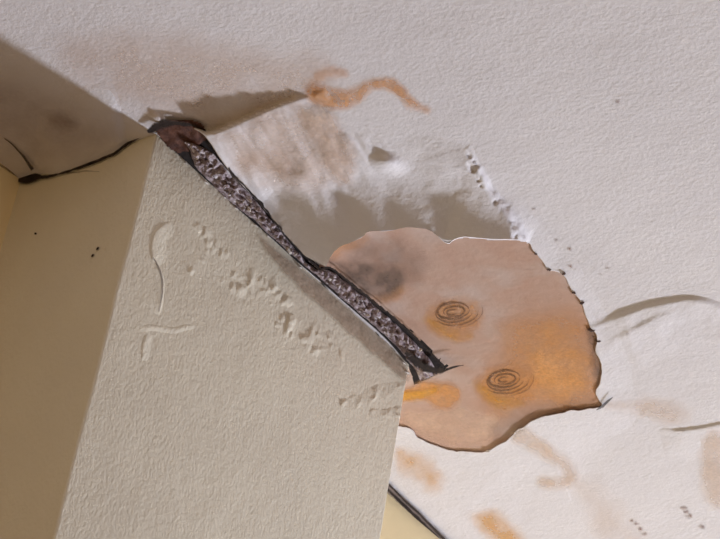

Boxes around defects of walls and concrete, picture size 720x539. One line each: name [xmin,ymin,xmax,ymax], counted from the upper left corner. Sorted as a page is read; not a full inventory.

crack [0,120,464,385]
corrosion [403,382,459,407]
peeling [258,170,641,537]
corrosion [504,320,594,404]